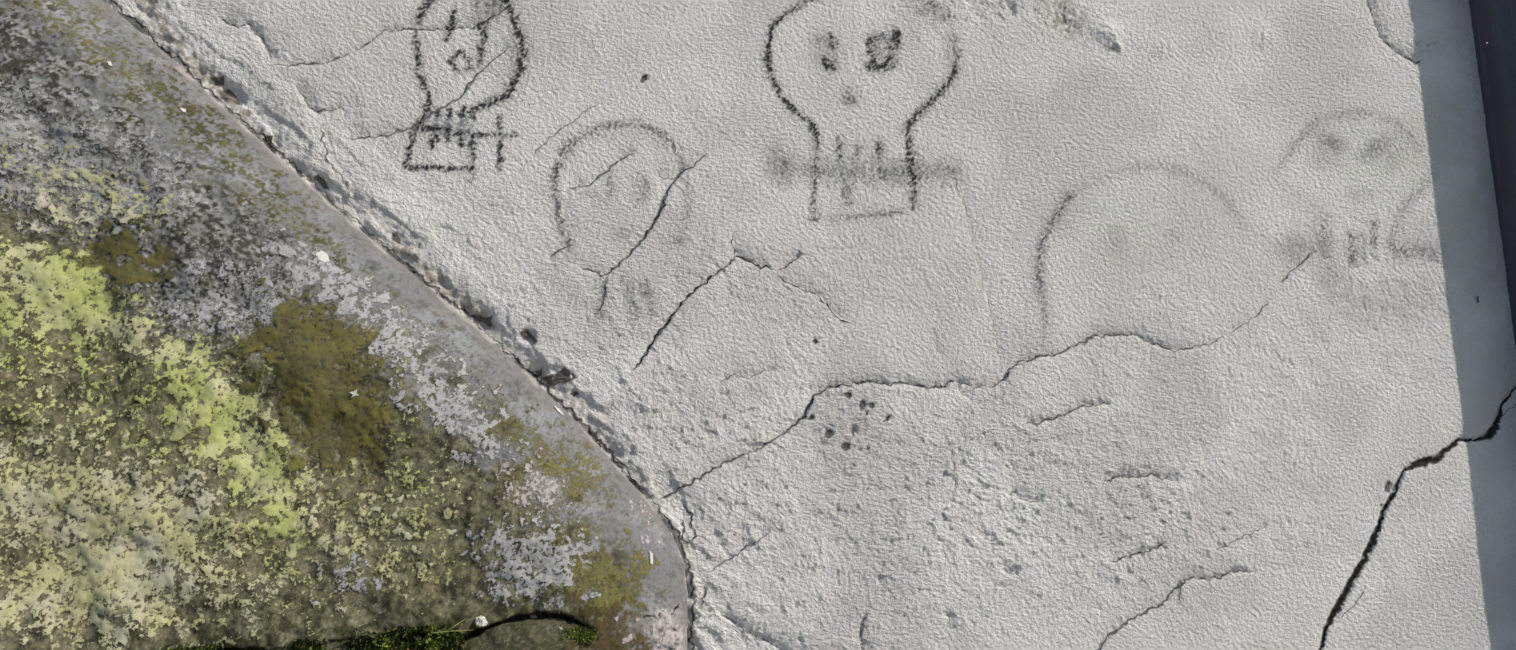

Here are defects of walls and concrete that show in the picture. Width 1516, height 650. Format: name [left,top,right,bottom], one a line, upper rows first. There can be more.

crack [1319,386,1516,650]